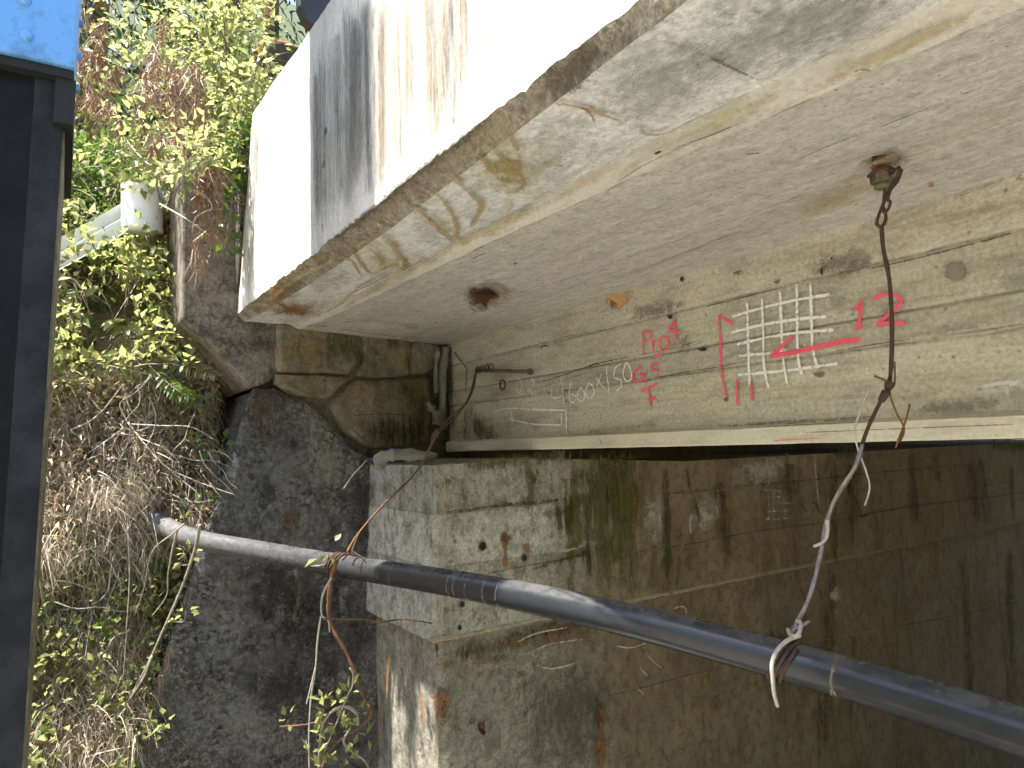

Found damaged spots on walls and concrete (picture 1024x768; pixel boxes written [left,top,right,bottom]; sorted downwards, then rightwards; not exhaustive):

leakage [312,0,465,229]
spalling [464,283,509,312]
spalling [606,291,632,310]
leakage [432,451,681,593]
rust [501,532,509,567]